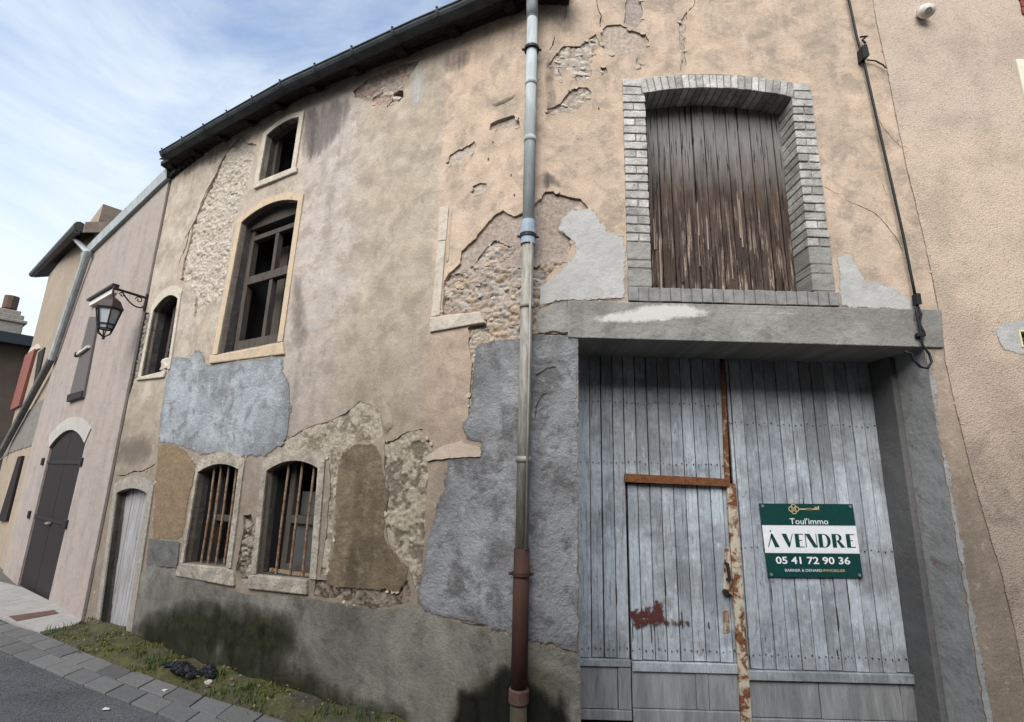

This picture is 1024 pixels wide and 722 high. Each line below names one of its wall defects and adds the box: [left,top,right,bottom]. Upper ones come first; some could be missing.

flaking render [355,63,418,107]
flaking render [446,131,477,167]
flaking render [491,116,520,144]
flaking render [545,0,650,115]
flaking render [179,132,257,315]
flaking render [440,189,594,413]
peeling [281,401,433,609]
damp [138,603,353,706]